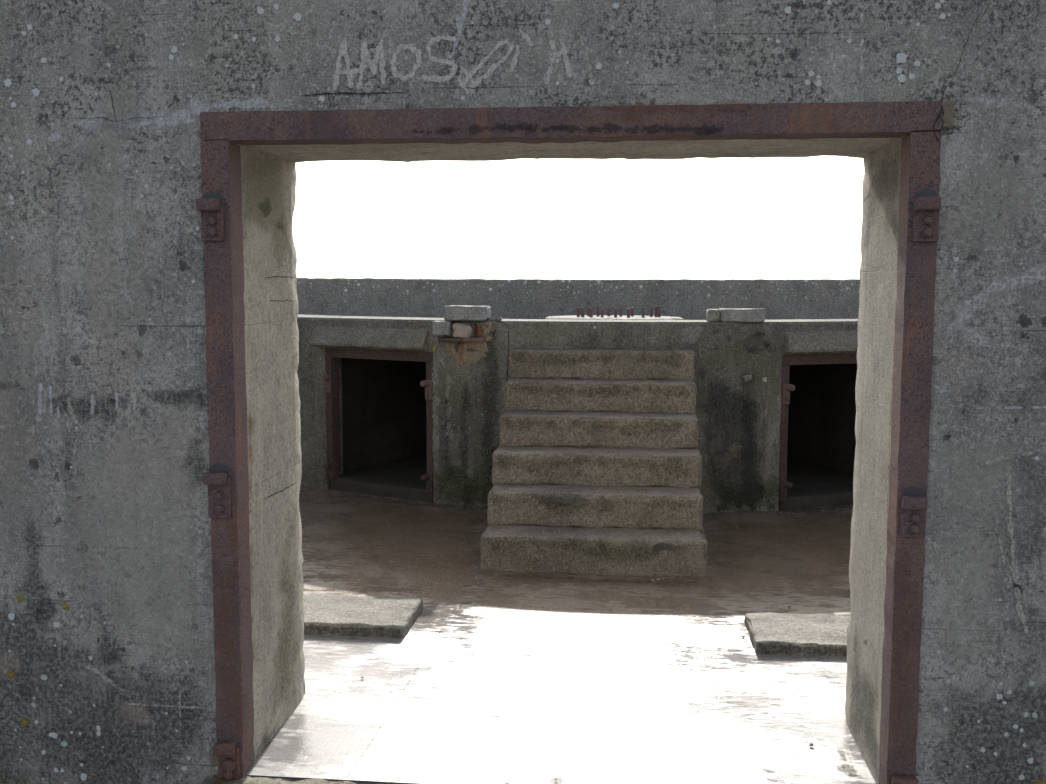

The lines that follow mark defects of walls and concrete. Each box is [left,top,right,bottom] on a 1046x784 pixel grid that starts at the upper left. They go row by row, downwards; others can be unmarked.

rust [412,104,723,136]
rust [438,322,485,342]
leakage [330,331,853,649]
leakage [304,624,400,638]
leakage [0,528,203,784]
leakage [757,643,847,655]
leakage [942,687,1046,784]